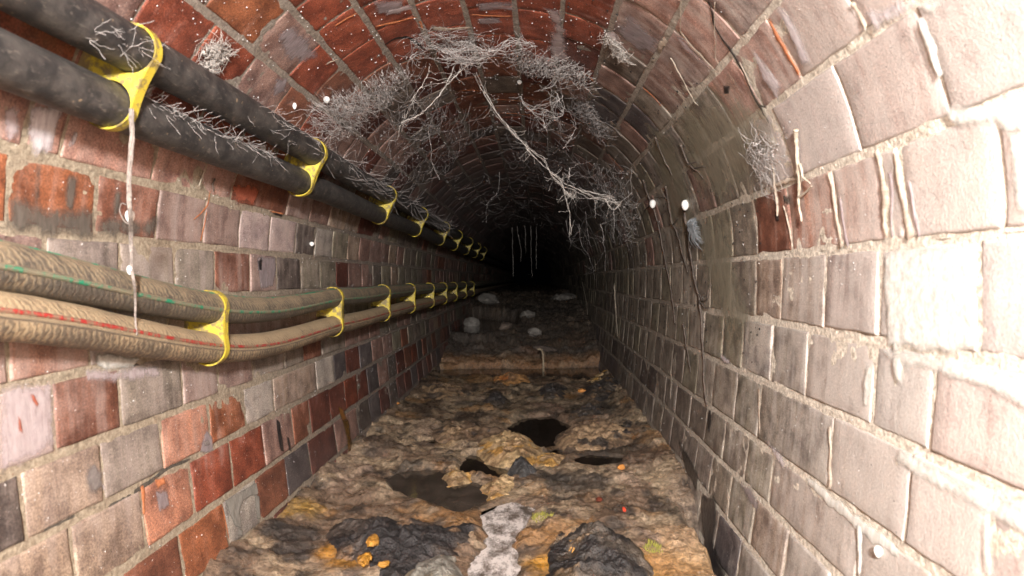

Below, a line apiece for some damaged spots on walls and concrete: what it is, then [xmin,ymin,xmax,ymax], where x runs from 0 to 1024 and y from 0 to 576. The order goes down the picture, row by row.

damp [808,427,897,574]